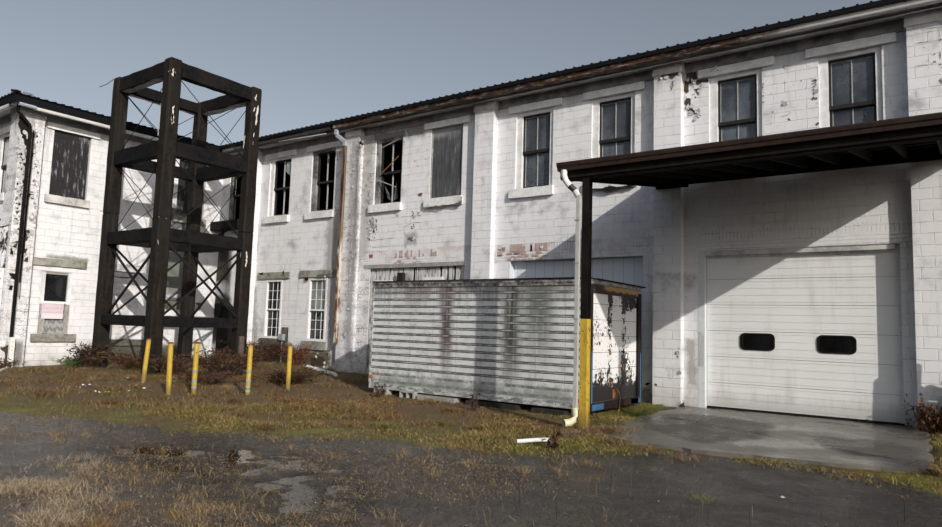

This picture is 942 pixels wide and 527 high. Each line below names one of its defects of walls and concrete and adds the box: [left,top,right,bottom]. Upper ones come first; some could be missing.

peeling [659,66,719,121]
peeling [10,115,42,262]
peeling [497,243,548,260]